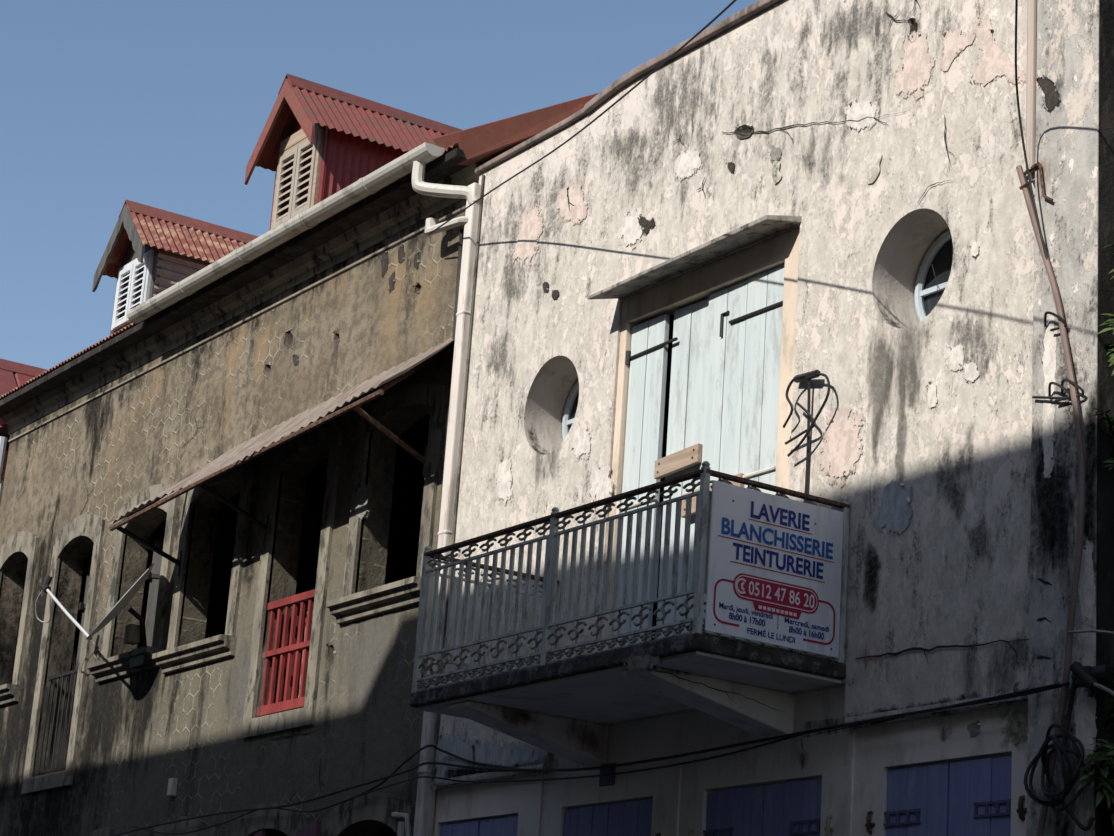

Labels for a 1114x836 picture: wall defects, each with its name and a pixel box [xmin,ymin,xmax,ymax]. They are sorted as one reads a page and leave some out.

damp [822,0,889,54]
crack [722,107,906,150]
peeling [511,204,543,265]
peeling [556,182,588,225]
peeling [619,208,655,249]
damp [869,313,920,482]
damp [1035,384,1099,581]
damp [863,545,880,610]
damp [0,497,180,836]
crack [855,617,1052,673]